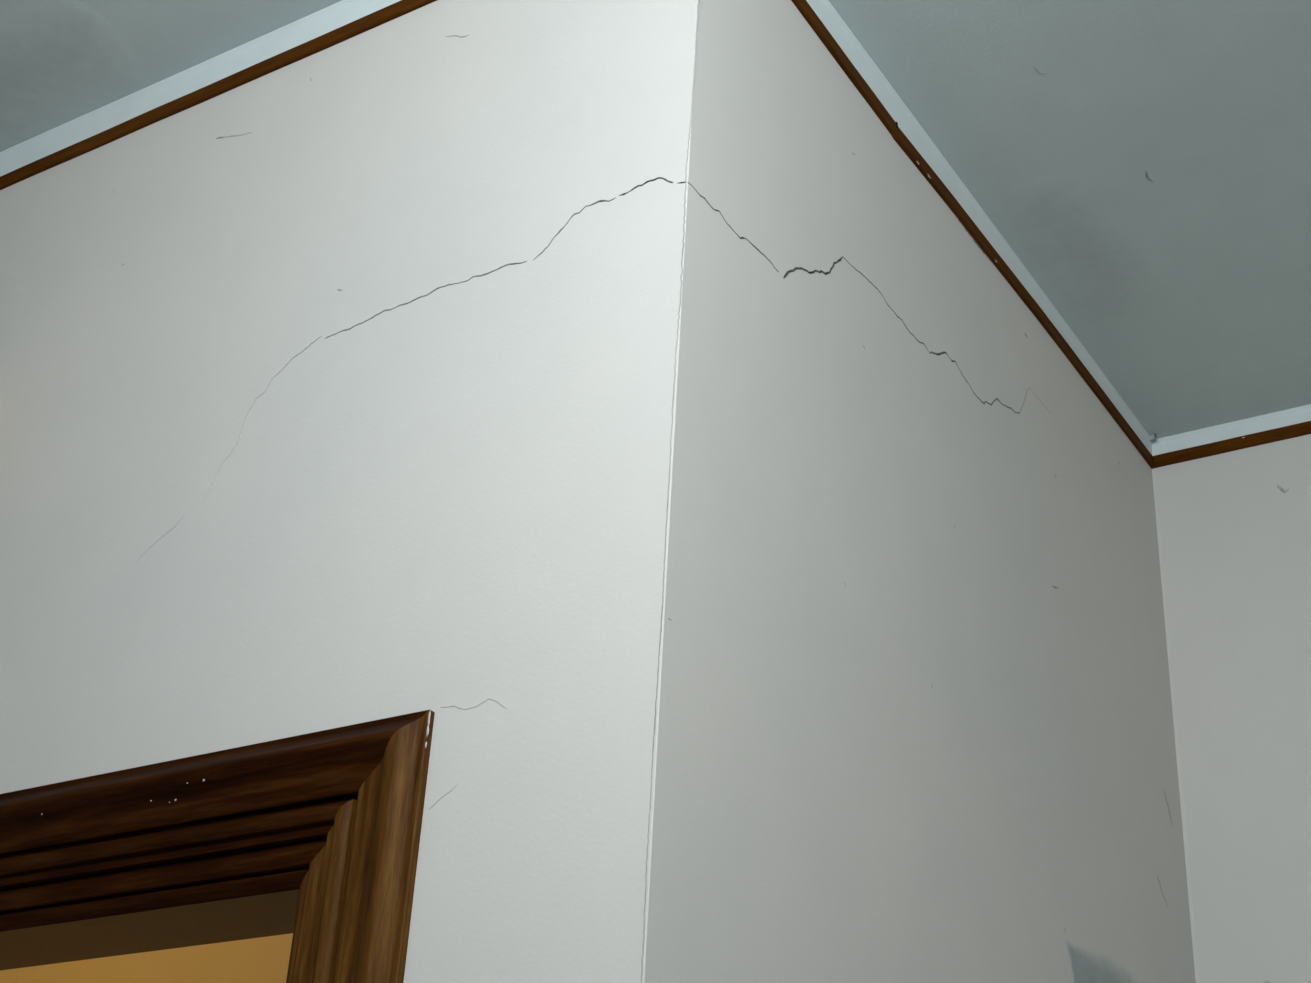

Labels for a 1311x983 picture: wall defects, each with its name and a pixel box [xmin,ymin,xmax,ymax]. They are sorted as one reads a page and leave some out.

crack [137,0,1050,983]